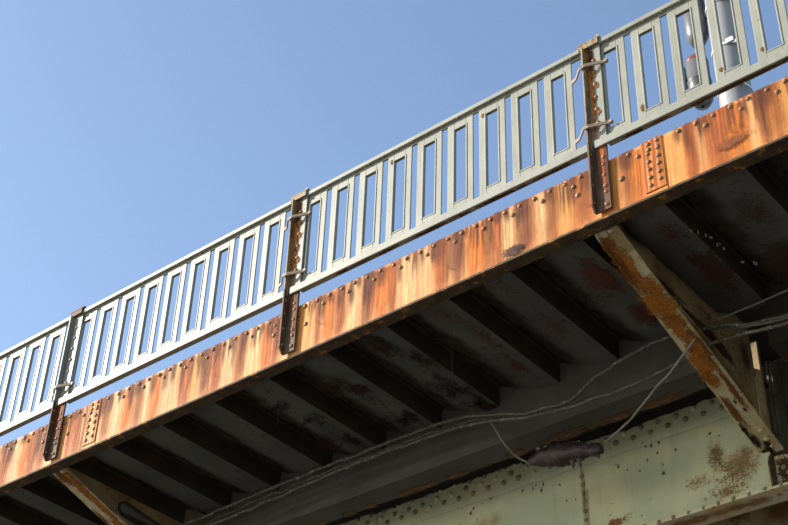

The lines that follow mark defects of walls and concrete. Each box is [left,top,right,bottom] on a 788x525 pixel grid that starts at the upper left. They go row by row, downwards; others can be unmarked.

rust [586,48,601,138]
rust [684,58,788,110]
rust [674,76,788,177]
rust [619,135,664,199]
rust [0,145,609,486]
rust [597,233,748,426]
rust [537,391,688,447]
rust [55,468,124,525]
rust [674,498,788,525]
rust [701,439,763,500]
rust [776,454,788,483]